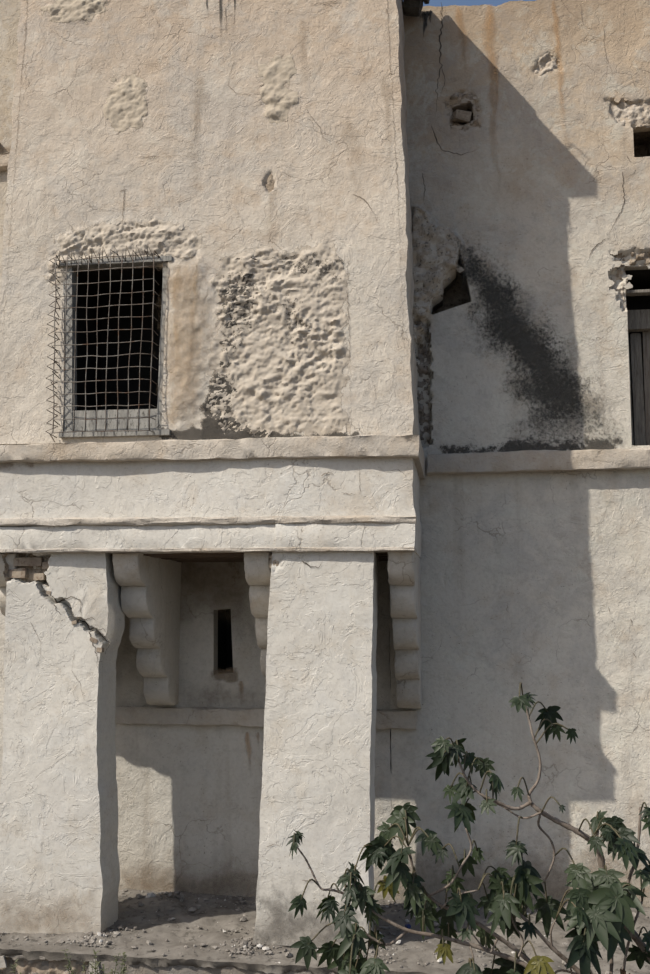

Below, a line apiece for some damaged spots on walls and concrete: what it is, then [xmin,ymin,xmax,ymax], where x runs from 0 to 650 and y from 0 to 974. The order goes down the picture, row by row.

crack [431,4,473,155]
spalling [412,206,464,447]
spalling [606,250,650,311]
damp [440,438,622,454]
crack [45,583,110,699]